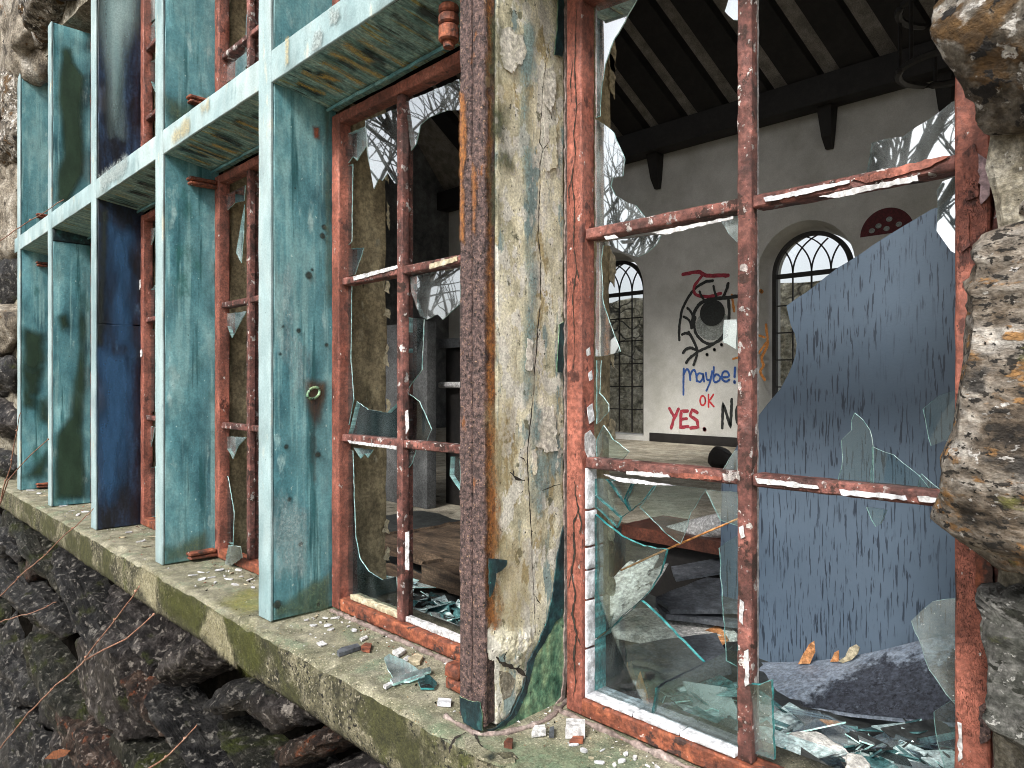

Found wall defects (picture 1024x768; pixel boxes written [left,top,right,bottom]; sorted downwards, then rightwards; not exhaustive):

flaking render [499,20,527,73]
flaking render [542,65,558,172]
corrosion [459,93,501,559]
crack [510,9,582,695]
leakage [273,576,328,616]
corrosion [487,579,504,631]
spalling [494,662,524,719]